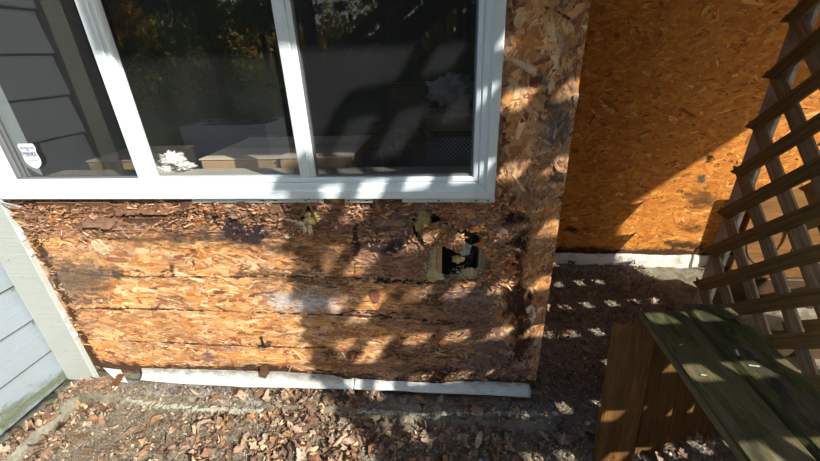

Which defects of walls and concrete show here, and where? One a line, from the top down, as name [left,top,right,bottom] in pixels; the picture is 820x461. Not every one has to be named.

water stain [16,204,123,370]
water stain [113,211,487,327]
peeling [297,200,349,241]
peeling [372,201,401,216]
spalling [408,202,508,292]
water stain [498,194,530,258]
water stain [246,363,319,374]
water stain [324,340,477,383]